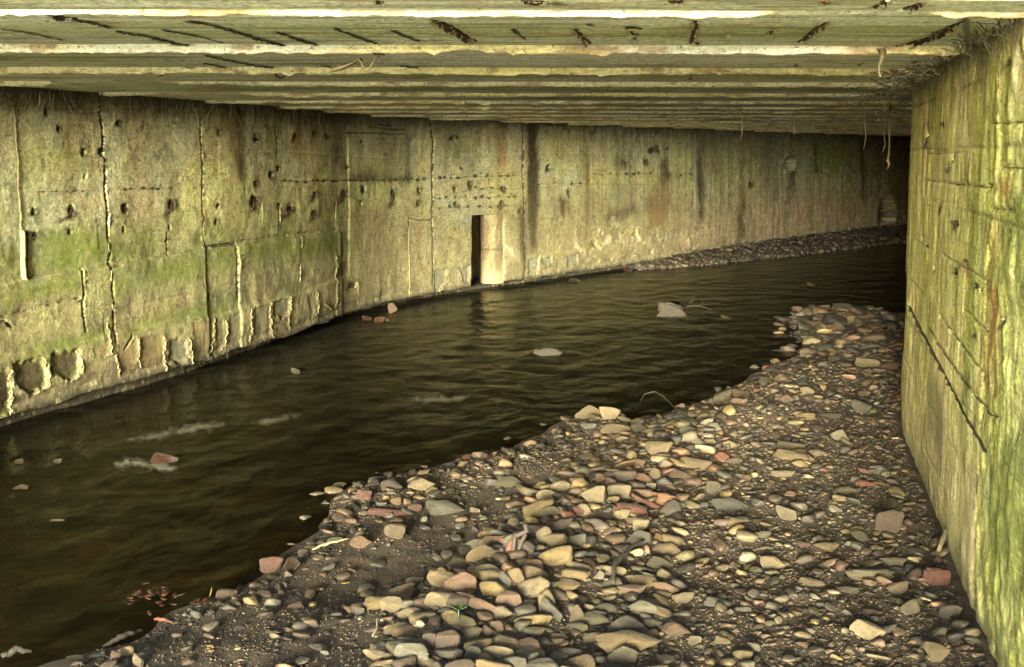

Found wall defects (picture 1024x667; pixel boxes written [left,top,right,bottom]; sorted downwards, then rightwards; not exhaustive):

crack [0,105,694,348]
leakage [0,44,970,249]
spalling [0,350,84,418]
crack [907,305,997,454]